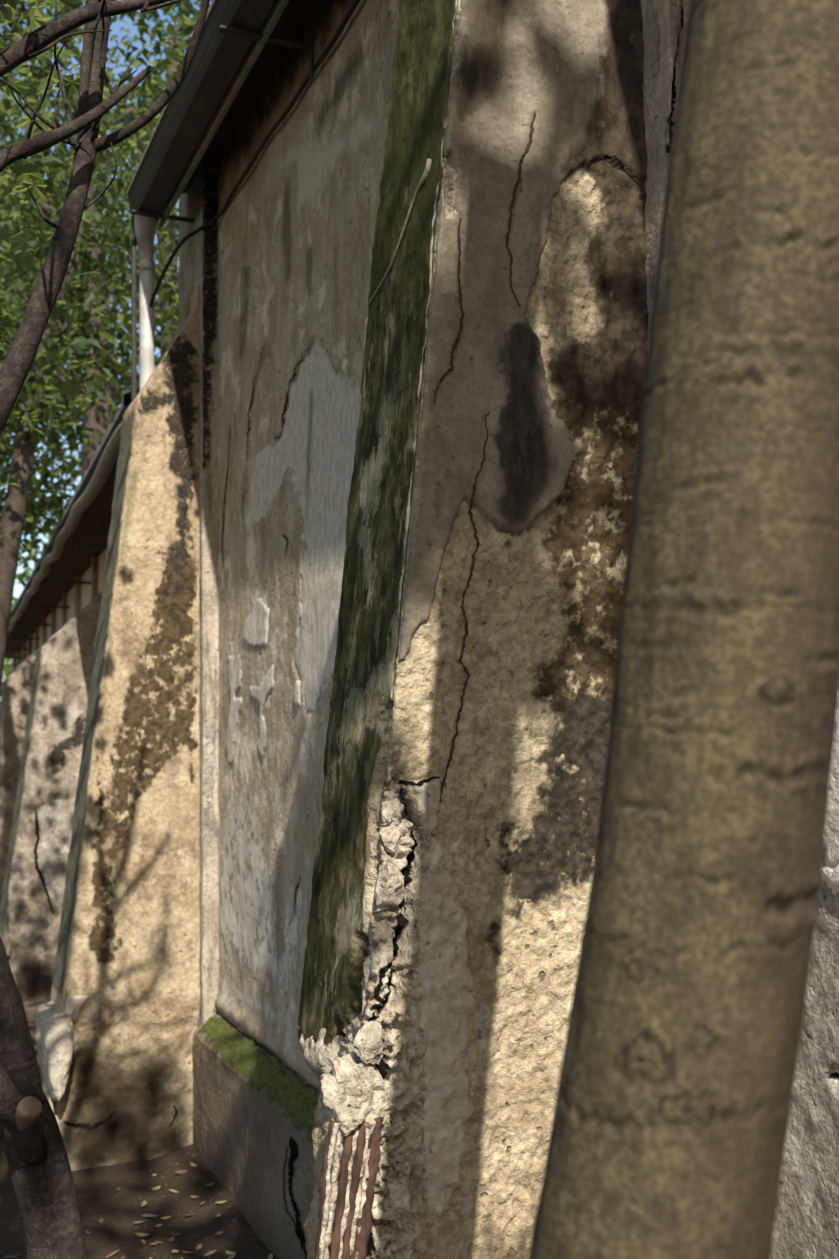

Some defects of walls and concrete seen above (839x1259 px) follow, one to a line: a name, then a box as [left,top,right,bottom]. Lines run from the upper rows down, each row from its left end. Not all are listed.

damp [262,52,379,275]
crack [434,218,465,404]
damp [460,0,511,115]
crack [506,112,536,307]
crack [668,0,684,150]
damp [88,171,218,963]
flaking render [245,337,361,713]
damp [494,0,649,920]
damp [48,714,86,775]
flaking render [203,598,274,849]
spalling [297,733,476,1259]
crack [283,1136,307,1259]